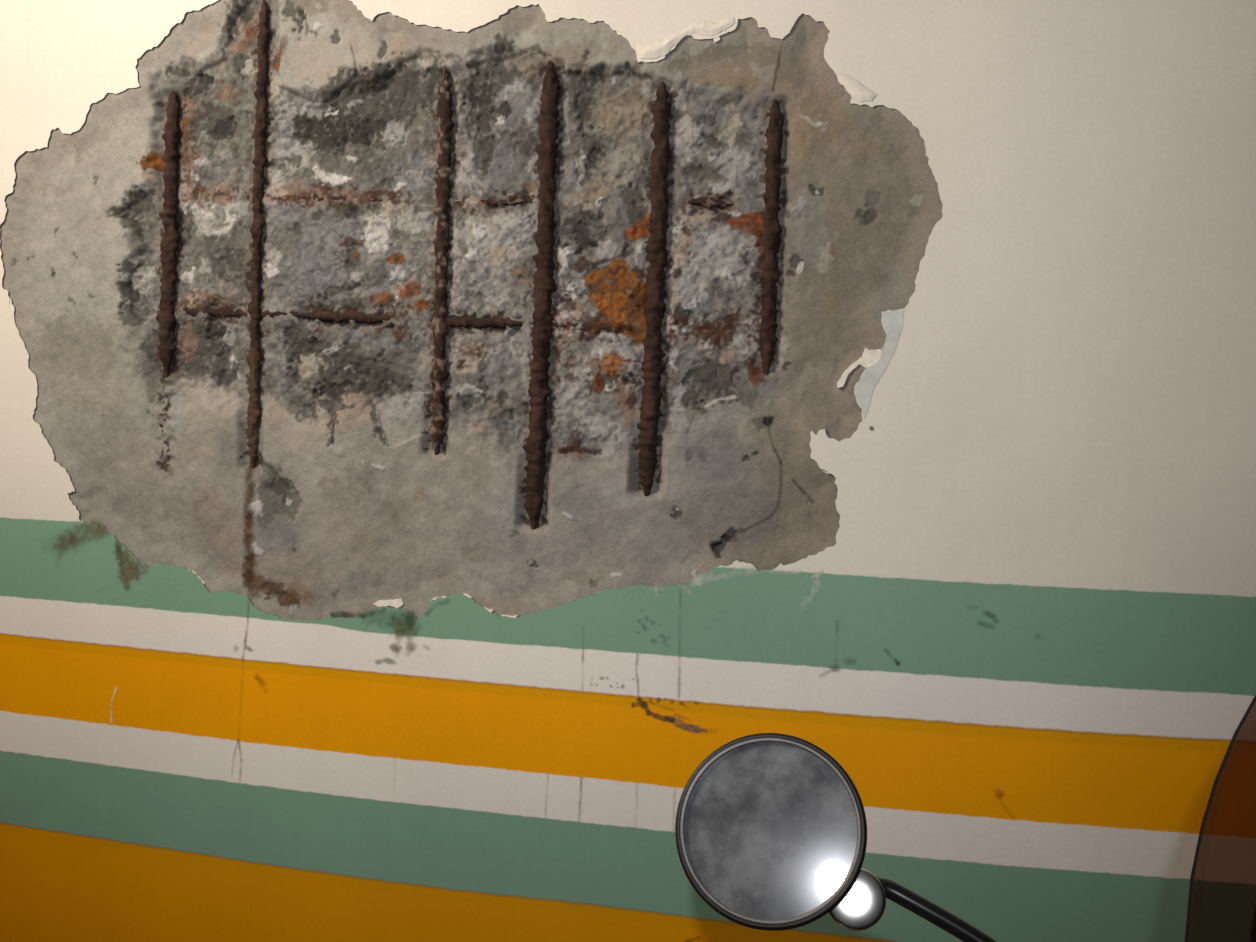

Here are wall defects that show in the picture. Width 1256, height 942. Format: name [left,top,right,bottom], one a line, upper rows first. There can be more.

rust [140,153,165,171]
rust [626,215,650,240]
rust [729,212,764,266]
rust [387,253,404,264]
rust [369,282,429,311]
spalling [1,0,943,620]
rust [584,259,648,344]
rust [595,354,621,390]
crack [763,417,773,425]
rust [559,438,601,453]
rust [244,458,258,537]
crack [710,477,802,553]